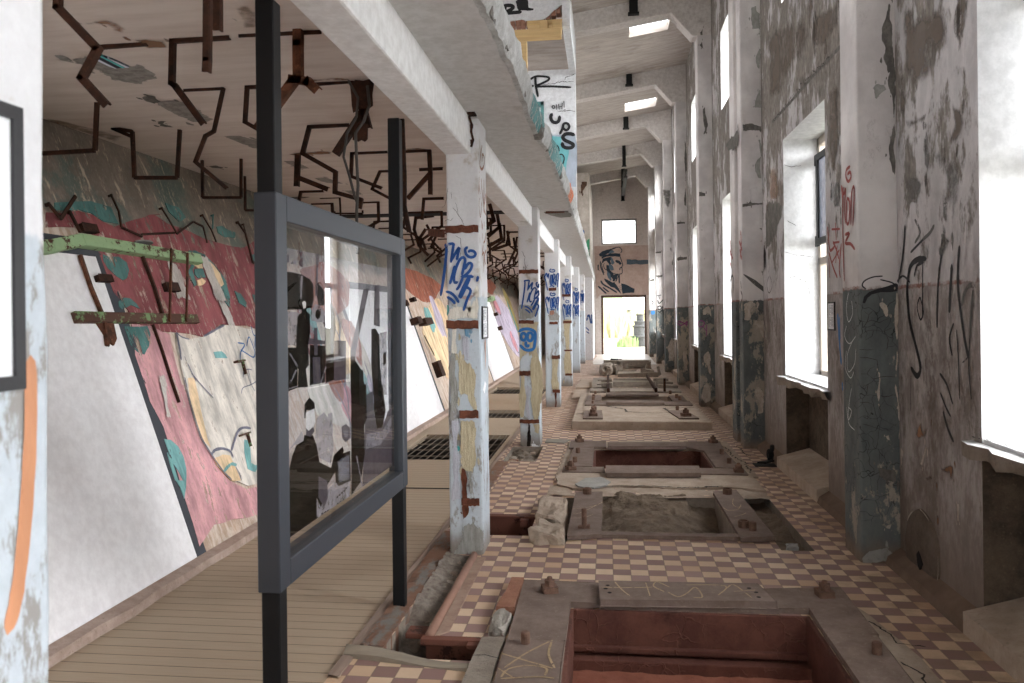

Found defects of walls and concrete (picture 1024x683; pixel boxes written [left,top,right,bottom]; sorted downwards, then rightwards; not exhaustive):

spalling [55,55,213,127]
peeling [725,45,840,178]
peeling [873,0,896,174]
peeling [742,200,782,275]
peeling [448,285,484,554]
peeling [518,304,572,447]